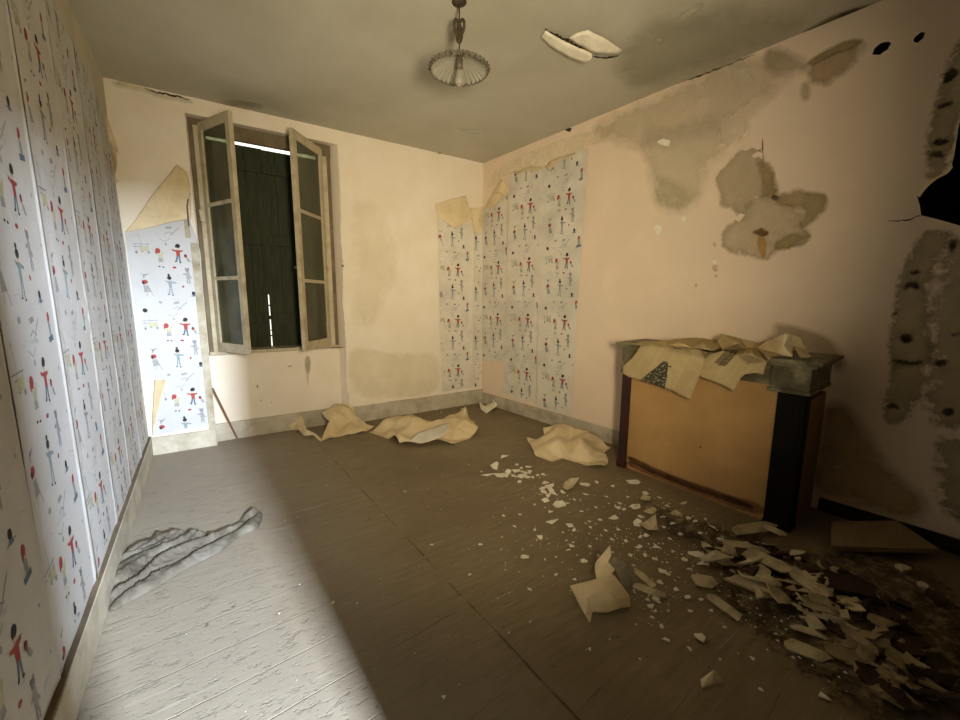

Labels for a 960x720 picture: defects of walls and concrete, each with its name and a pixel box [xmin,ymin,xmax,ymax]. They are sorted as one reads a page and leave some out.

peeling [541,29,622,63]
leakage [809,41,860,83]
spalling [872,42,891,55]
spalling [917,123,960,226]
leakage [716,144,826,259]